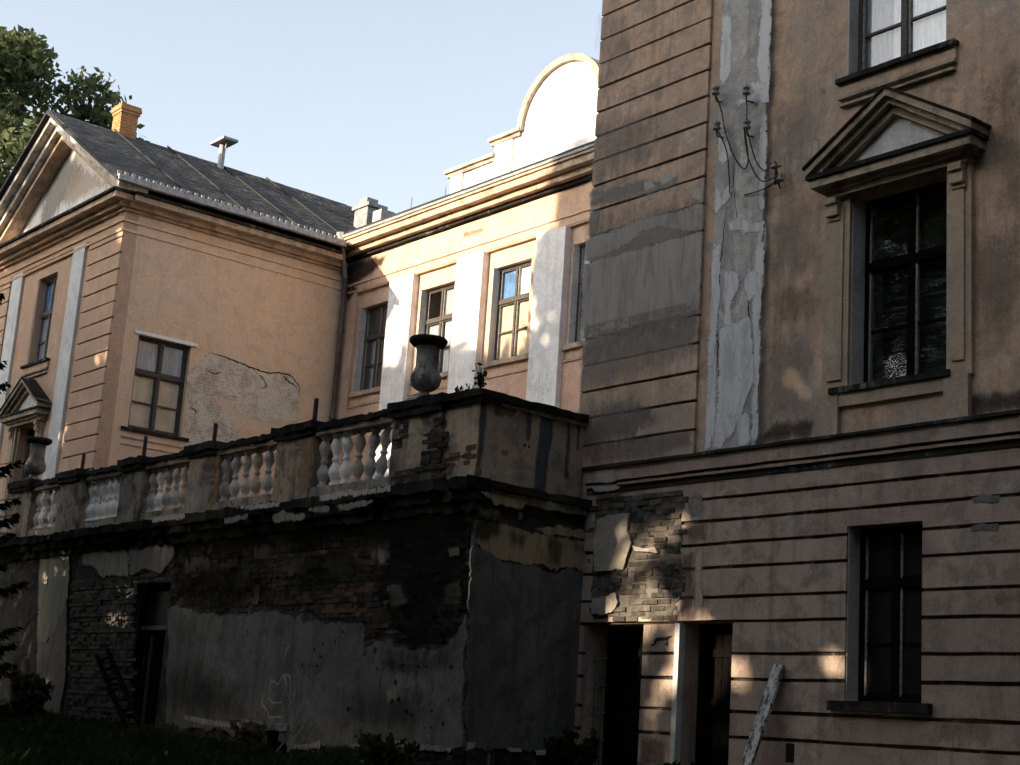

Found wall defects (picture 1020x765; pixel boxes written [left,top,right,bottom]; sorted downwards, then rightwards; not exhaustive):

peeling [588,172,677,235]
peeling [689,182,732,214]
peeling [704,0,772,450]
peeling [180,354,301,451]
flaking render [224,416,481,524]
flaking render [477,469,689,621]
flaking render [36,543,216,725]
flaking render [319,582,382,656]
flaking render [184,713,289,729]
flaking render [286,740,320,751]
flaking render [383,739,452,753]